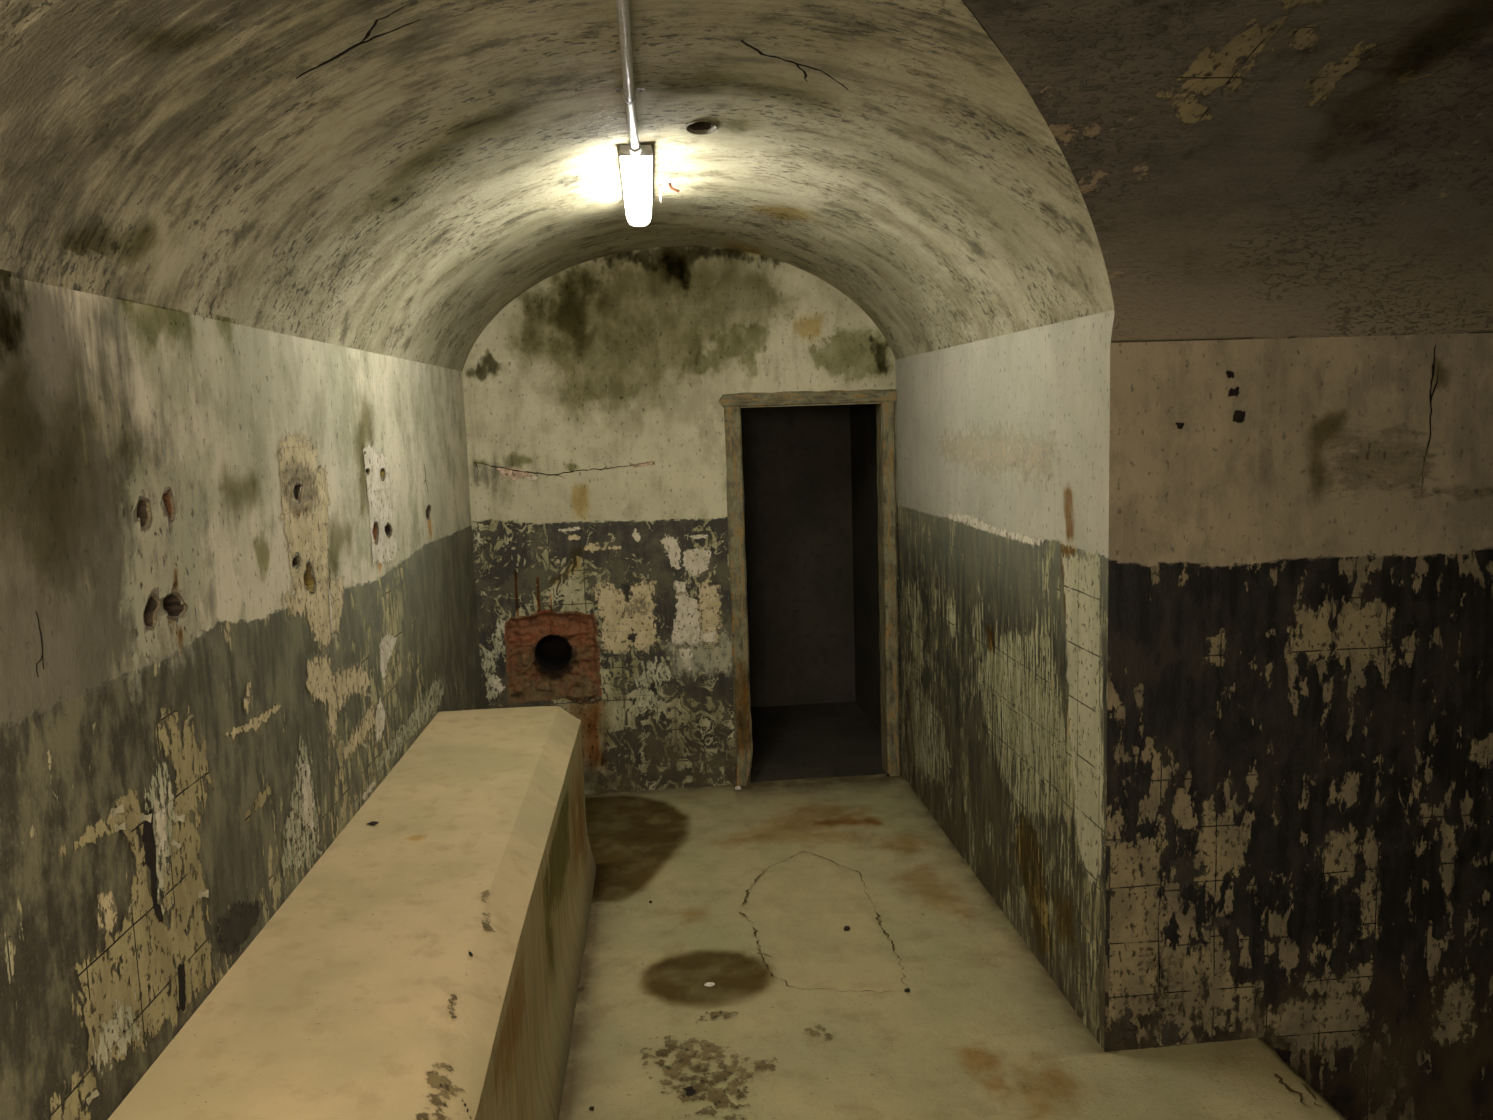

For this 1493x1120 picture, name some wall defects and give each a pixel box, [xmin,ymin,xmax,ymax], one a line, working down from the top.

crack [296,5,420,79]
crack [741,40,848,90]
mould [608,247,779,288]
water stain [468,352,498,379]
crack [1421,345,1439,488]
flaking render [277,430,446,808]
spalling [479,534,732,712]
peeling [45,705,217,1120]
water stain [585,796,685,899]
water stain [647,952,767,1002]
crack [739,851,908,993]
peeling [981,552,1395,1066]